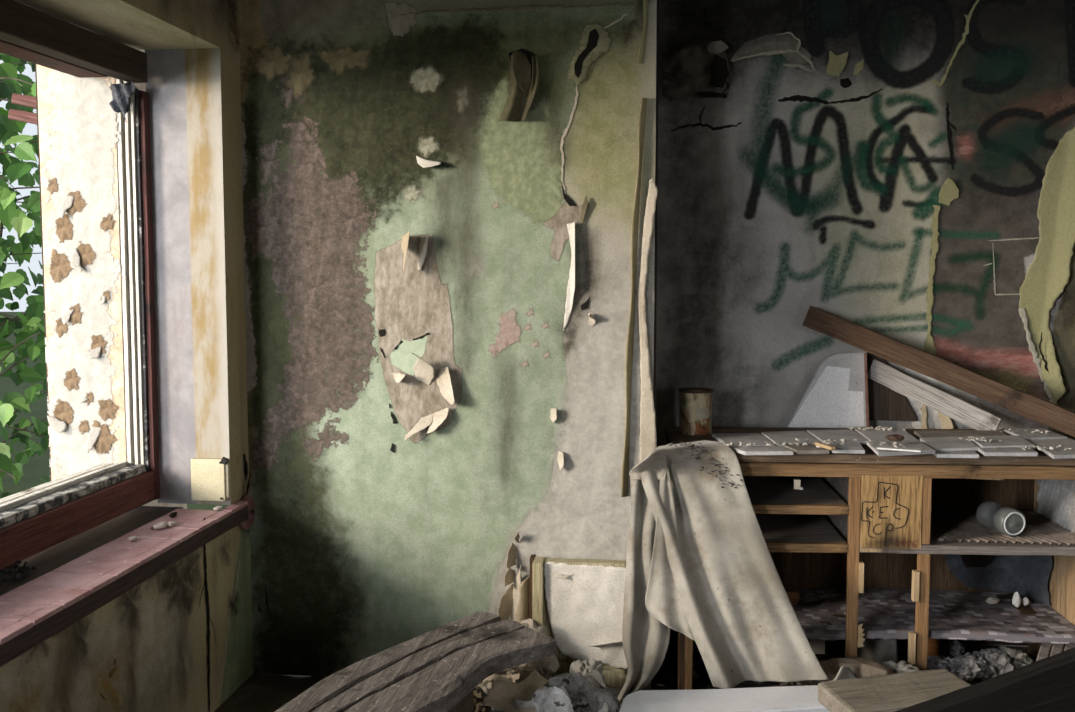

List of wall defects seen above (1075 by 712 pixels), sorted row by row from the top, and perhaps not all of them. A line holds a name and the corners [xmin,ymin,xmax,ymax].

peeling [43,70,121,479]
flaking render [241,44,462,493]
leakage [219,0,505,676]
peeling [480,48,596,331]
crack [671,106,742,132]
crack [778,88,883,104]
peeling [1018,127,1075,404]
leakage [162,554,200,613]
crack [199,518,216,712]
peeling [498,532,521,621]